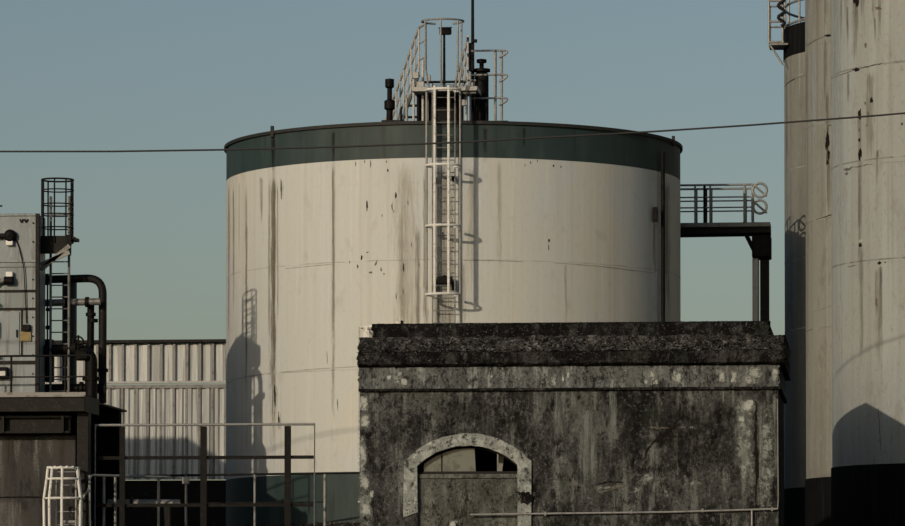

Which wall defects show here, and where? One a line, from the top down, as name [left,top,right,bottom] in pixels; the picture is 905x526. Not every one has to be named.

rust [268,182,278,416]
leakage [571,390,630,500]